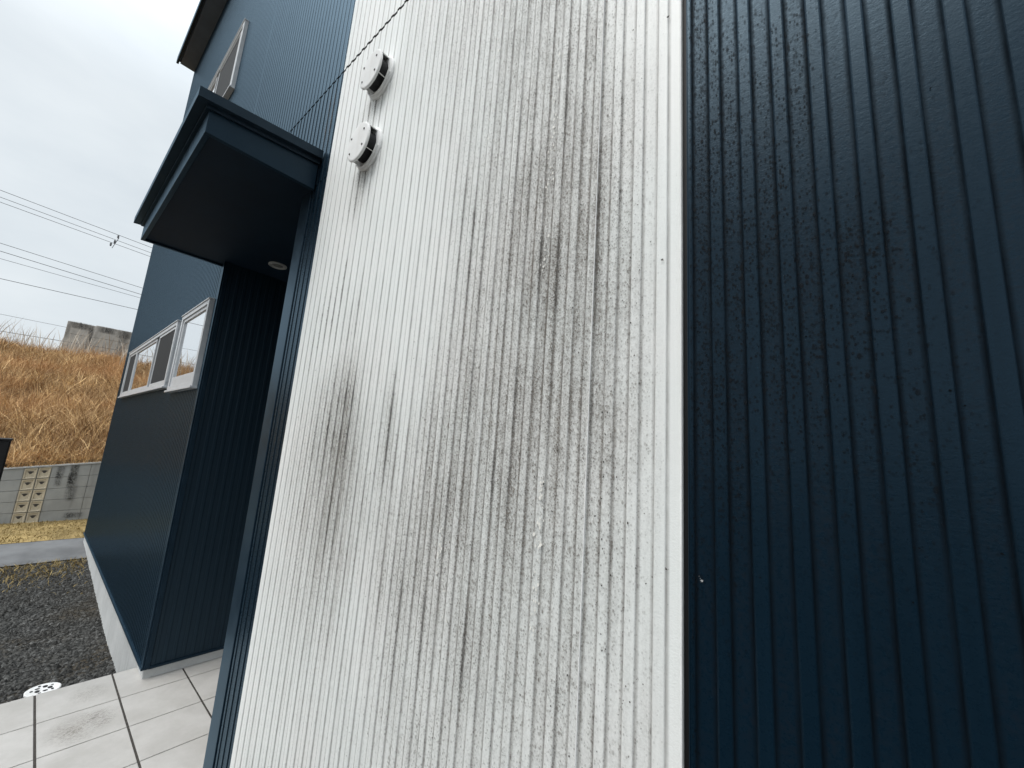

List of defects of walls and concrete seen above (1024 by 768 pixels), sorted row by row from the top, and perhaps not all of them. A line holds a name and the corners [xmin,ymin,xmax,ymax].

water stain [290,0,648,768]